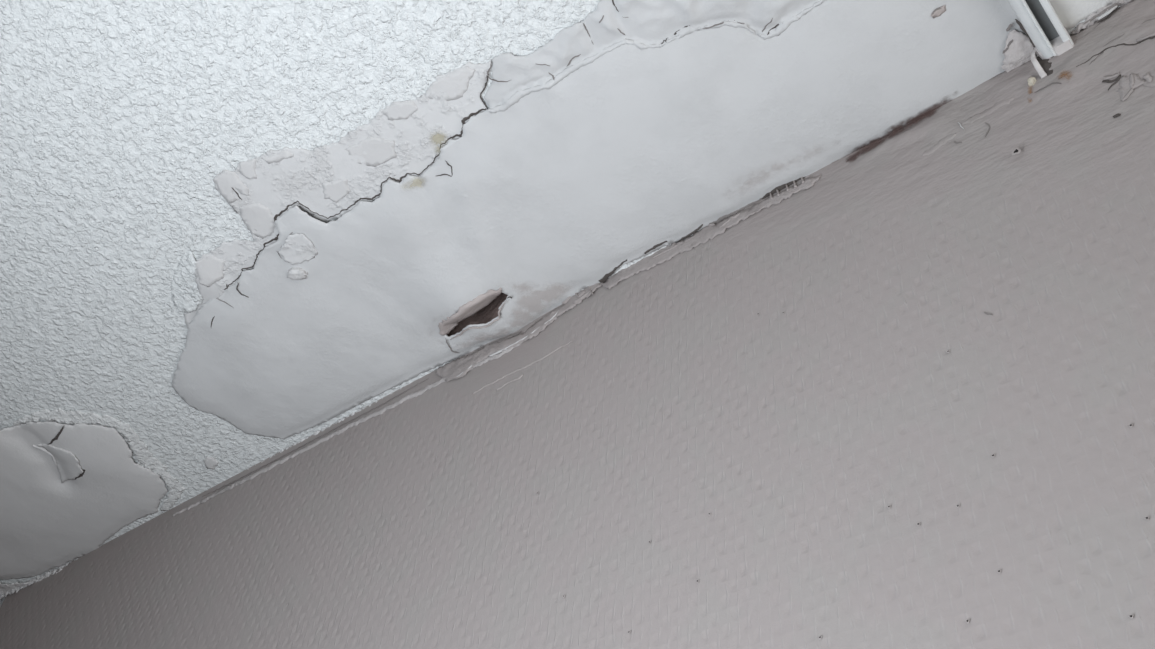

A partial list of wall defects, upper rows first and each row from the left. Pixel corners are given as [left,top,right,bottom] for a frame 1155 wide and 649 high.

flaking render [931,5,946,19]
peeling [1049,0,1120,29]
flaking render [1001,19,1053,76]
peeling [170,0,826,328]
crack [211,77,488,326]
spalling [438,288,512,353]
peeling [0,408,185,600]